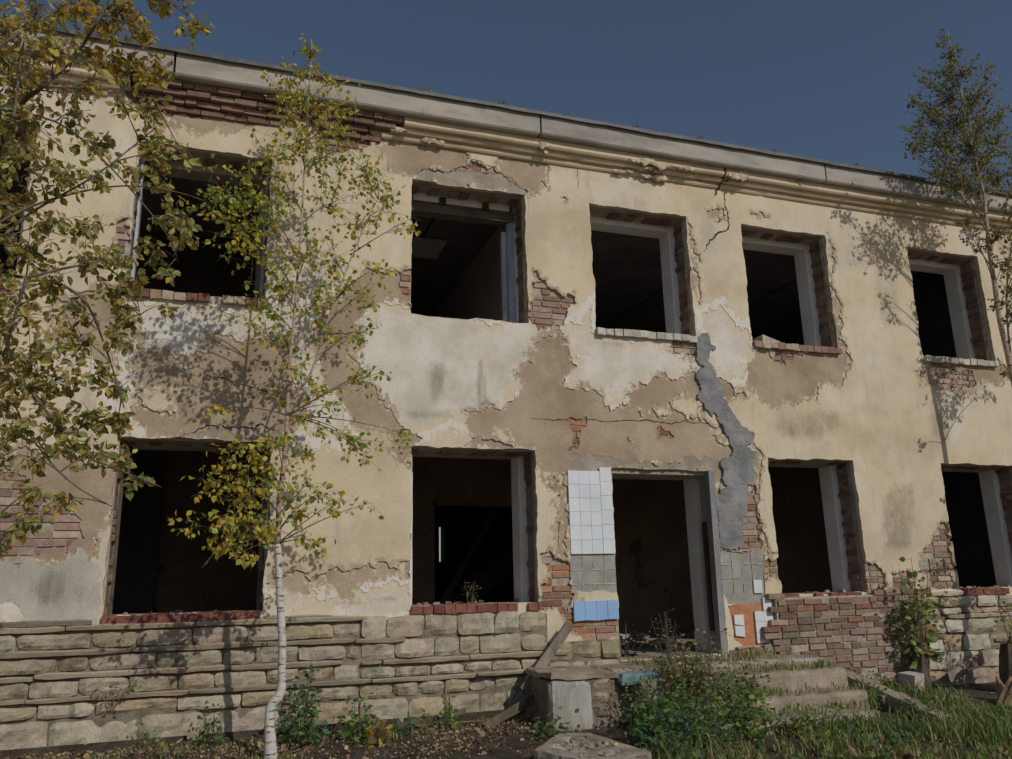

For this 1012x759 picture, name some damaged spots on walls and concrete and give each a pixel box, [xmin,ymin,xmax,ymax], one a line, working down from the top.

flaking render [125,75,549,197]
crack [715,168,729,196]
peeling [50,218,851,646]
peeling [917,358,1010,393]
peeling [0,445,116,568]